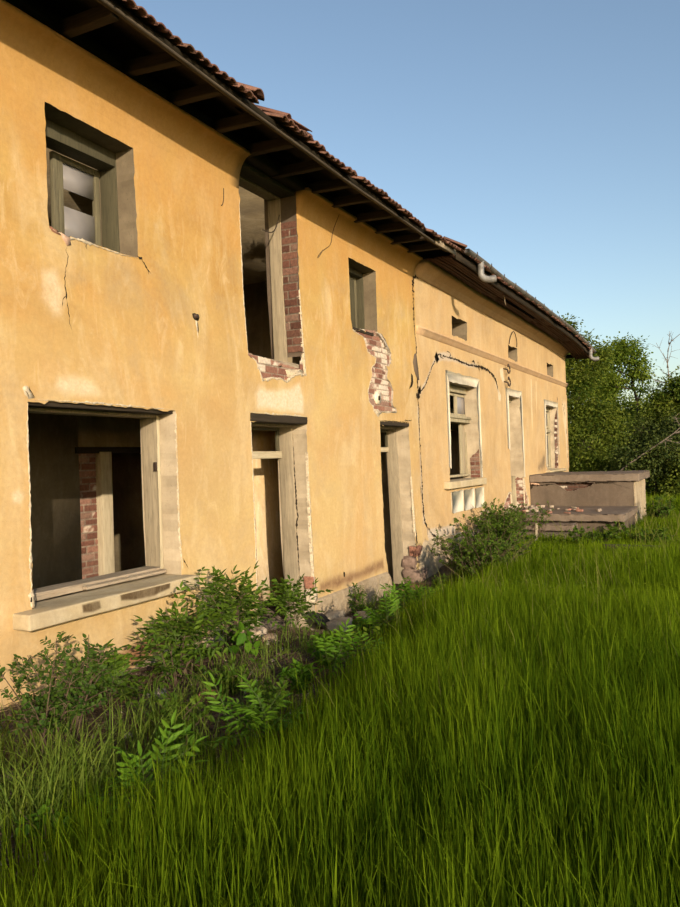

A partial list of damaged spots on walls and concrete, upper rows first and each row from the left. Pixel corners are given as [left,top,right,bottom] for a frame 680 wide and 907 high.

crack [62,244,87,326]
flaking render [239,202,307,627]
spalling [353,329,411,423]
crack [409,275,502,537]